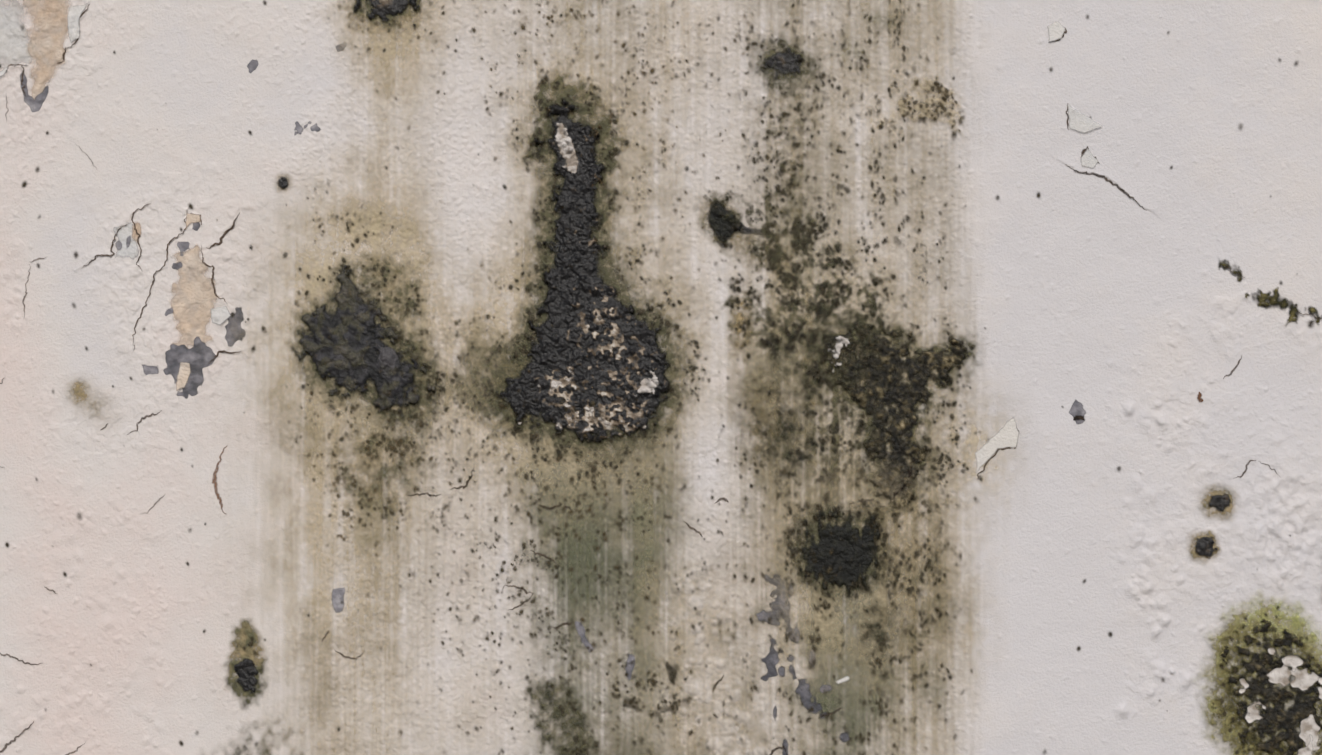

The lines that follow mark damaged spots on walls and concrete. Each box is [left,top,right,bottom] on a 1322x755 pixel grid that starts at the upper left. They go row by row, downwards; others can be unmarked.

peeling [0,0,89,112]
water stain [352,0,421,66]
water stain [514,3,600,57]
crack [1066,164,1145,210]
peeling [83,204,246,399]
water stain [279,50,710,679]
water stain [702,0,985,755]
peeling [975,418,1019,480]
water stain [1190,488,1233,559]
water stain [227,620,264,706]